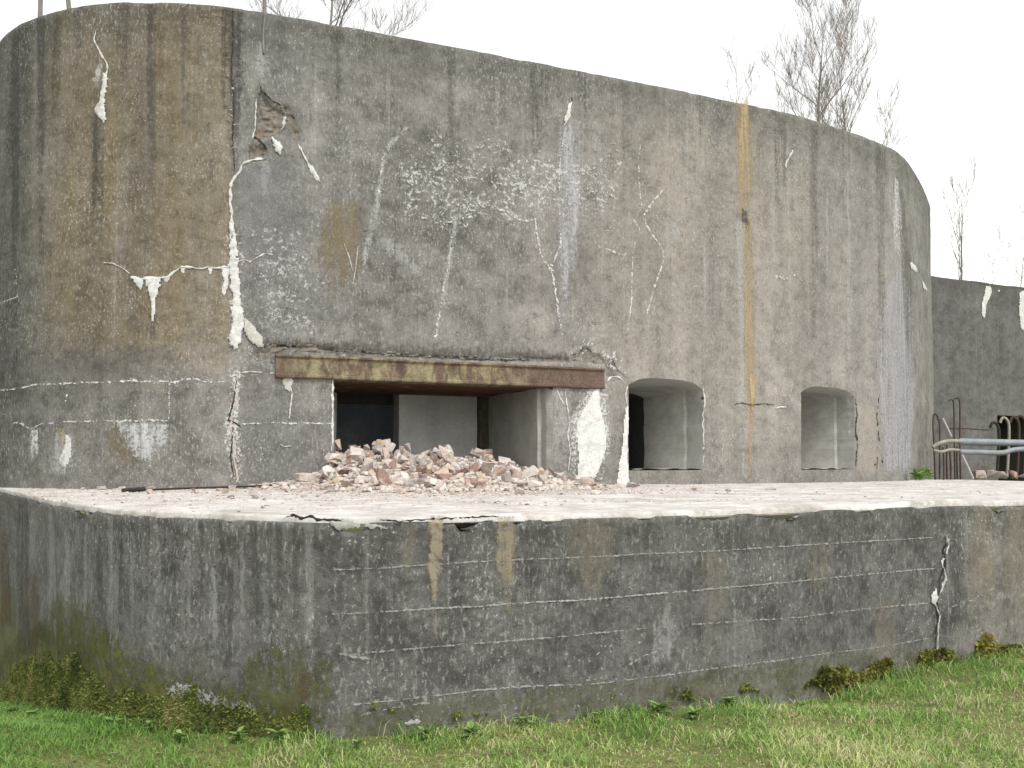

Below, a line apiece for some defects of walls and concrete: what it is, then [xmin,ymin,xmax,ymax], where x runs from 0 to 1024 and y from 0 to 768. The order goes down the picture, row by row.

leakage [91,31,108,234]
crack [2,9,318,476]
spalling [248,82,320,182]
efflorescence [390,135,627,236]
crack [534,97,583,335]
crack [627,145,682,331]
rust [736,100,756,471]
efflorescence [117,421,169,460]
flaking render [248,337,629,485]
leakage [427,516,444,600]
leakage [496,516,514,592]
crack [931,513,994,650]